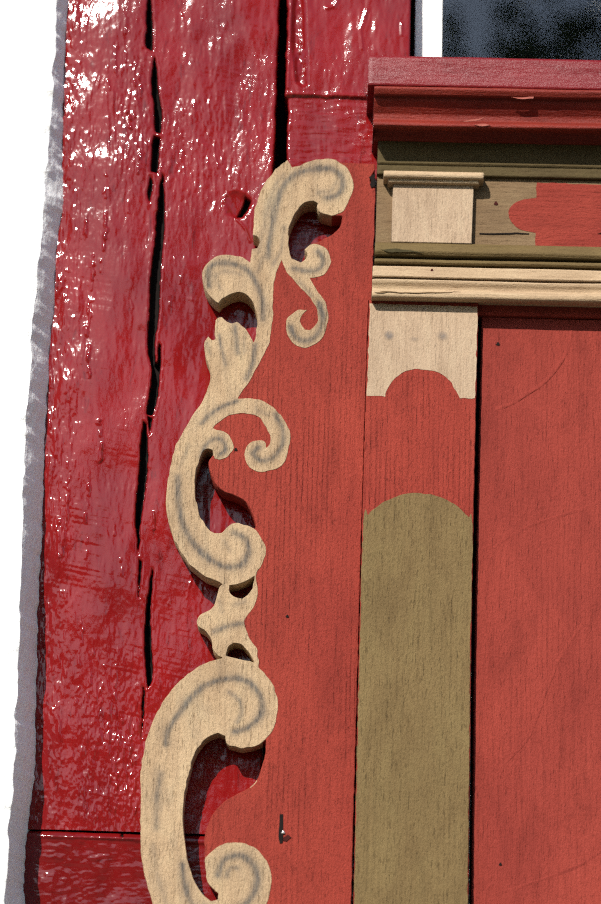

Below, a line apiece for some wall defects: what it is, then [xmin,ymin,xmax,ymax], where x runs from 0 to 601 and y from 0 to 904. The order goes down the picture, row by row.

crack [136,0,166,726]